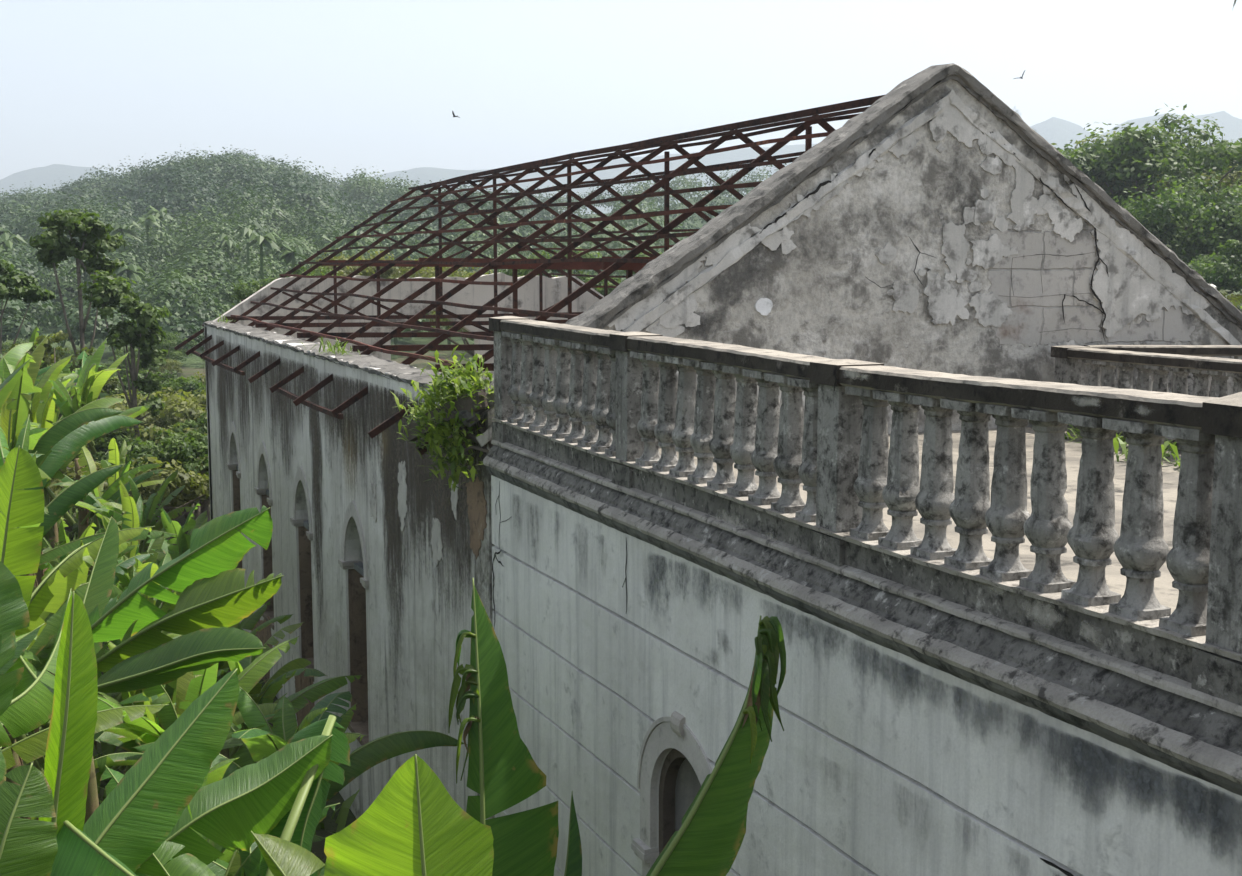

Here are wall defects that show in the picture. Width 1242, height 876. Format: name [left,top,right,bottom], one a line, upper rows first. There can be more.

spalling [607,104,1209,347]
crack [990,132,1109,340]
leakage [202,336,484,649]
leakage [884,660,918,686]